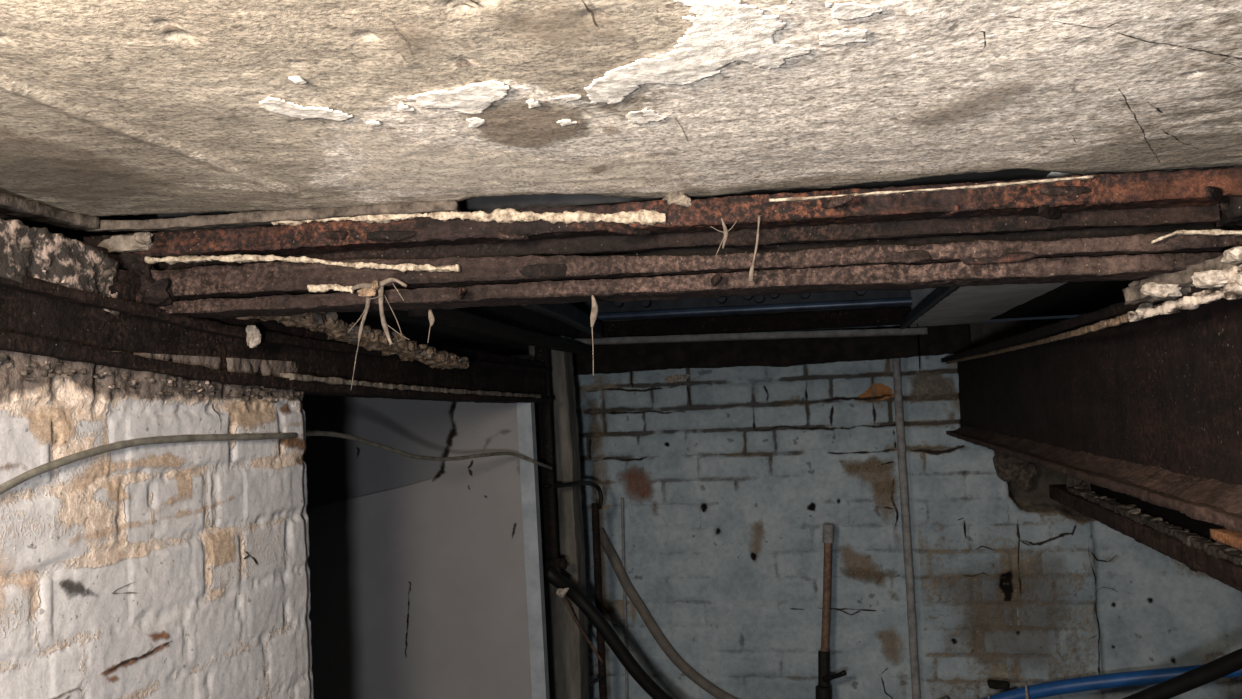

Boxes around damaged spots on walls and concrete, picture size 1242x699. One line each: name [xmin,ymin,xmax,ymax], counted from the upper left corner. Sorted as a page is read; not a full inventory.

peeling [398,0,882,148]
crack [981,16,1242,68]
leakage [185,167,317,193]
peeling [259,96,382,127]
leakage [338,125,697,192]
corrosion [605,223,652,236]
corrosion [1037,186,1092,220]
crack [1119,90,1189,162]
corrosion [1205,186,1229,204]
corrosion [157,250,1223,319]
peeling [911,264,1242,401]
spalling [753,383,896,493]